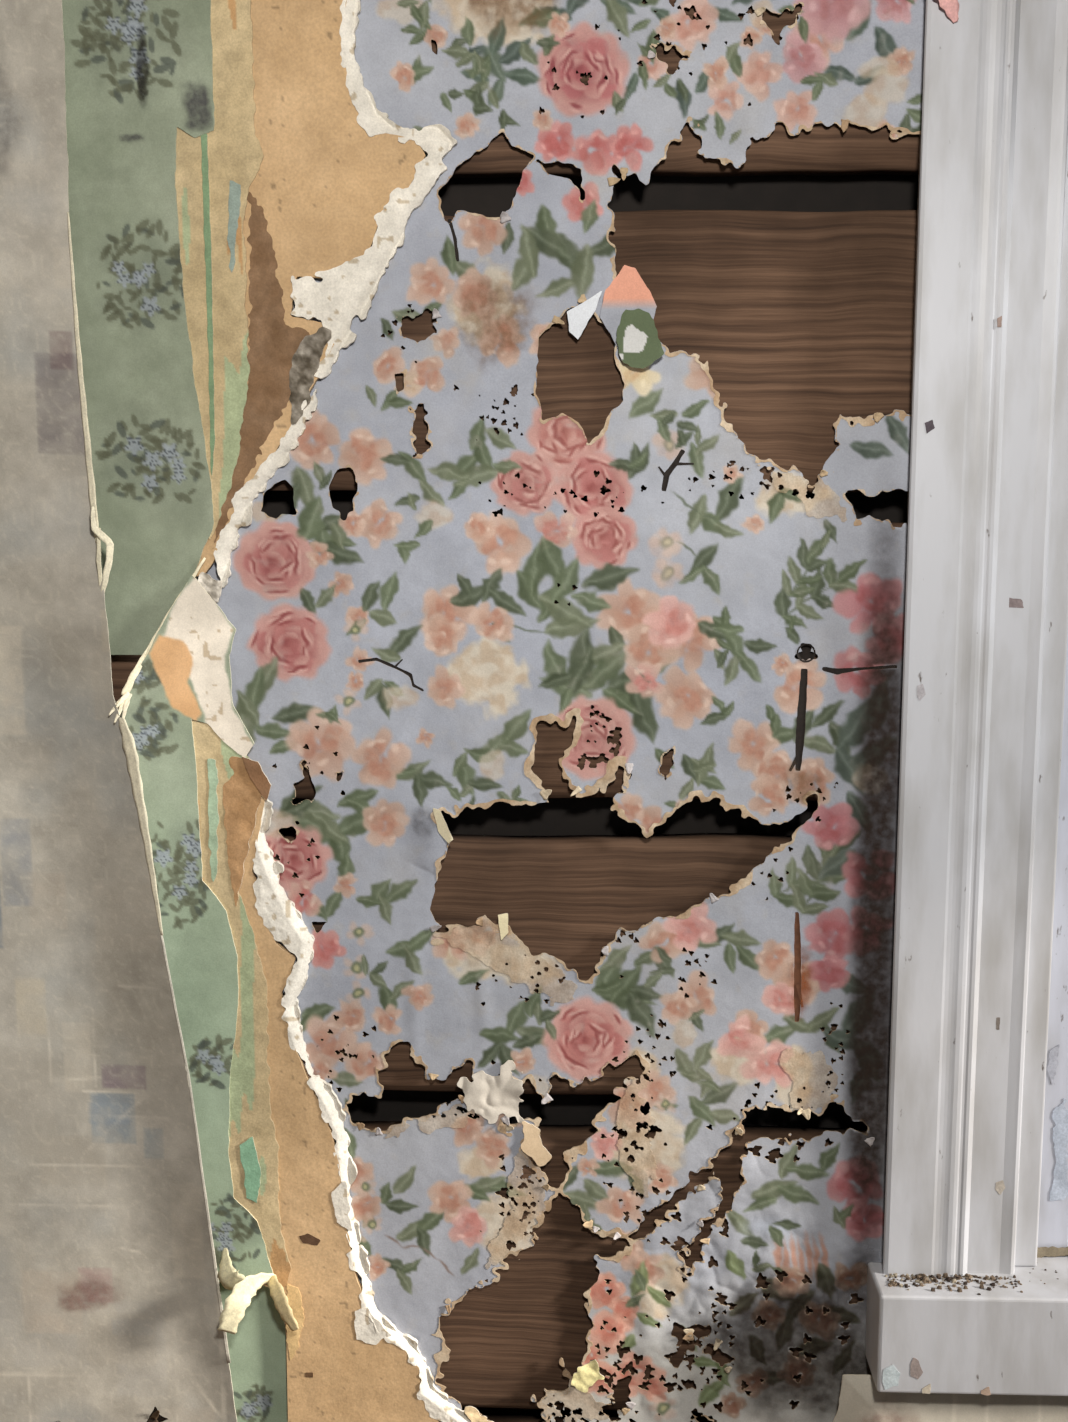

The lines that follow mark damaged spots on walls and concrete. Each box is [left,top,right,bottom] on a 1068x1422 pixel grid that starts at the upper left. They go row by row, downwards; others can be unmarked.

peeling [214,192,310,543]
peeling [758,464,847,522]
peeling [429,915,578,1006]
peeling [356,1095,475,1139]
peeling [616,1072,658,1198]
peeling [779,1048,838,1120]
spalling [299,1233,321,1246]
peeling [485,1151,549,1269]
peeling [583,1220,621,1240]
peeling [217,1248,304,1360]
peeling [354,1307,391,1345]
peeling [540,1379,636,1422]